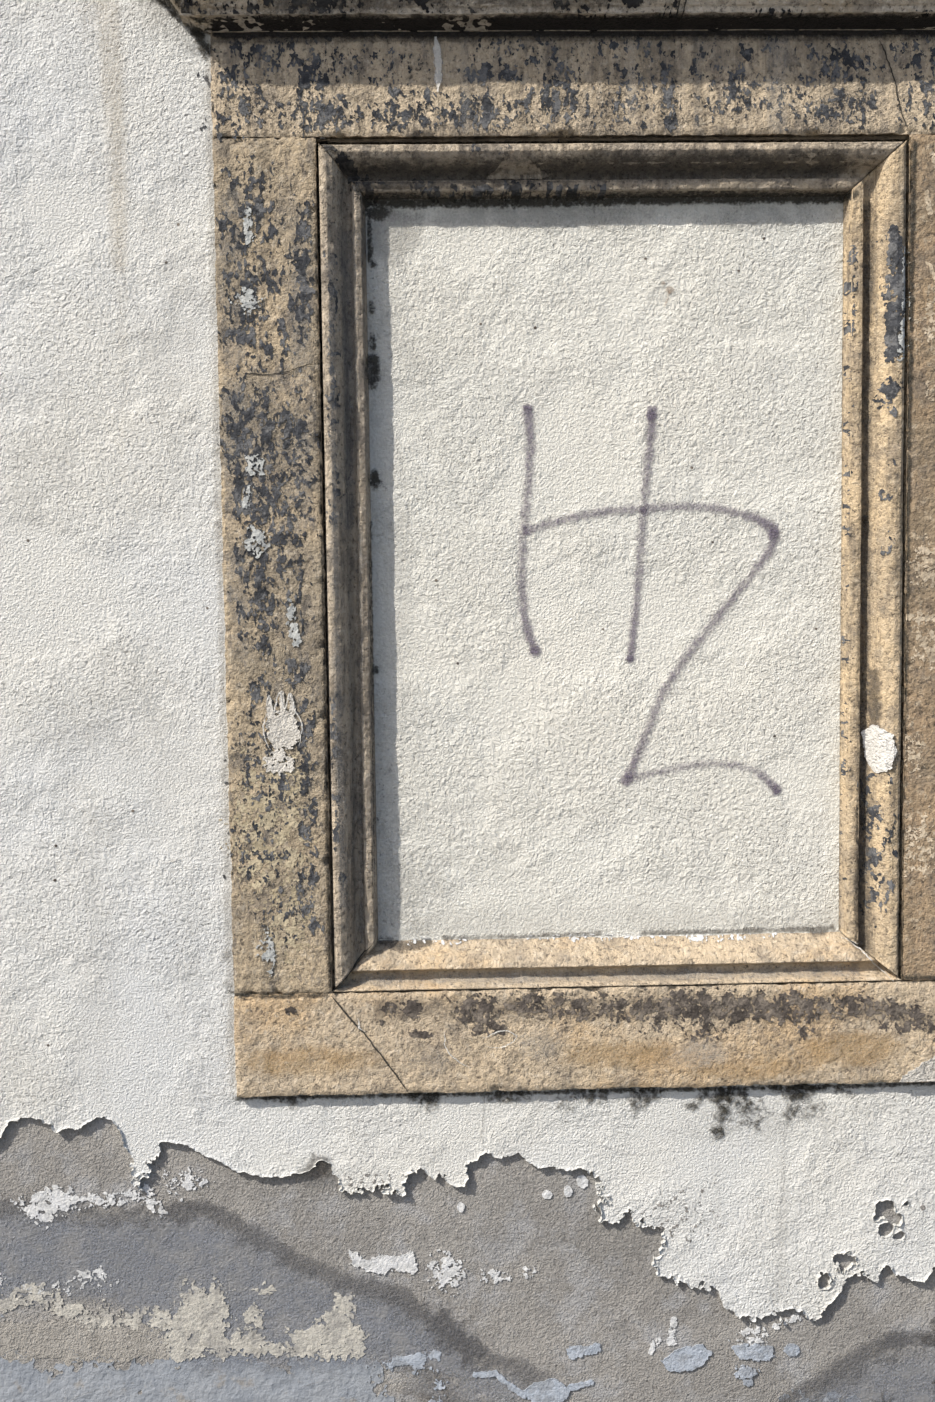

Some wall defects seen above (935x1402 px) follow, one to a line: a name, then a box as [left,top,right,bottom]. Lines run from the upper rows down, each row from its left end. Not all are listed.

leakage [153,0,211,59]
leakage [229,990,328,998]
leakage [236,1081,935,1138]
peeling [10,1166,215,1229]
peeling [542,1175,588,1199]
leakage [168,1202,542,1387]
peeling [348,1249,537,1297]
peeling [382,1349,448,1402]
peeling [472,1370,594,1402]
peeling [648,1316,712,1372]
peeling [728,1313,801,1387]
leakage [782,1333,935,1402]